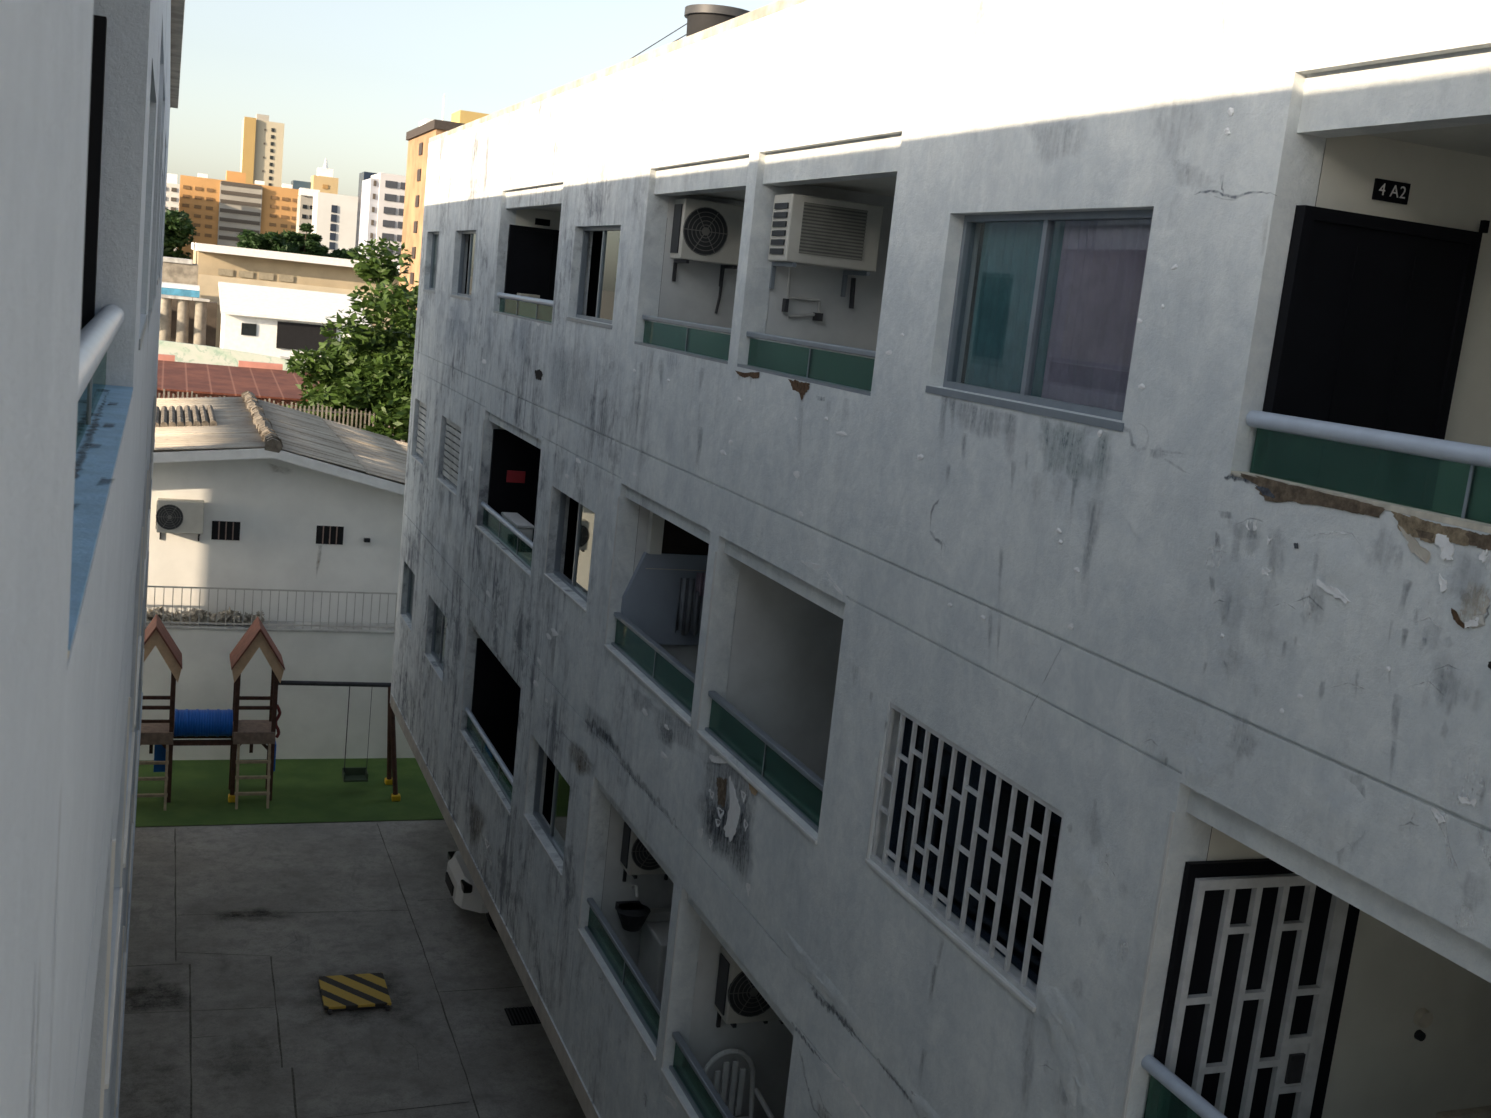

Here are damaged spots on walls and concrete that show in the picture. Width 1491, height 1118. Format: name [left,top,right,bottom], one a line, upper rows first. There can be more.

crack [1199,190,1262,199]
rust [788,379,822,400]
flaking render [1241,473,1491,592]
flaking render [1451,588,1489,629]
peeling [697,755,758,857]